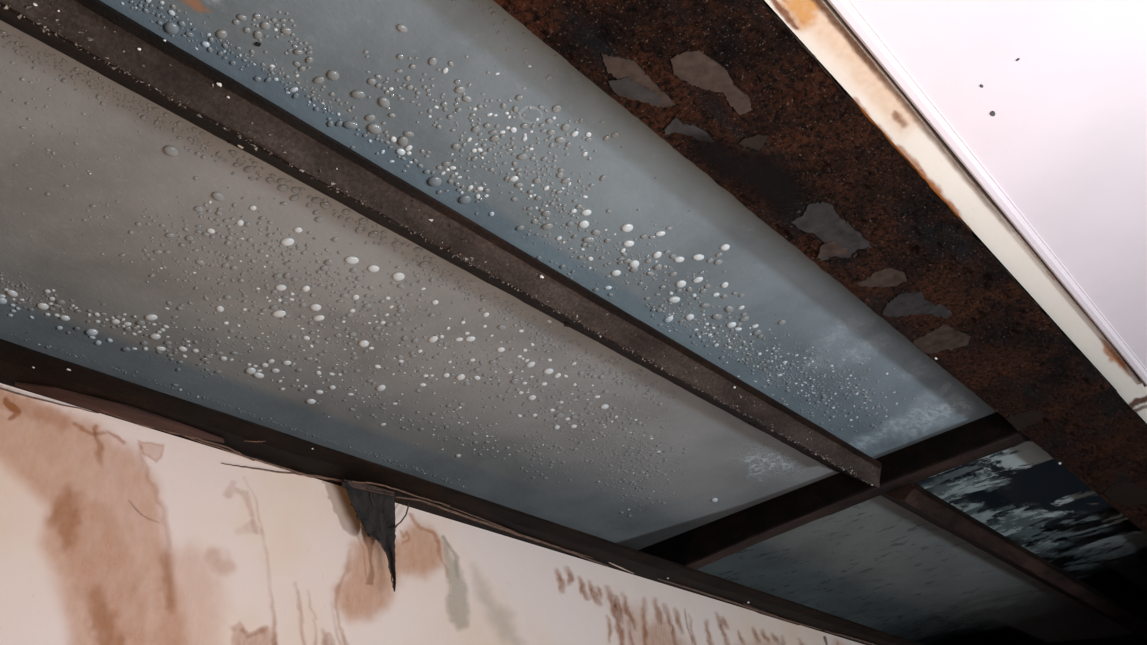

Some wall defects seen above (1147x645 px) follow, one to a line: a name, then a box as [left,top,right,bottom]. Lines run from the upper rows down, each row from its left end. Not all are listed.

peeling [601,53,714,142]
peeling [670,49,751,115]
rust [772,0,945,151]
rust [859,107,960,218]
peeling [791,201,872,261]
peeling [853,267,971,354]
rust [1104,344,1126,370]
water stain [4,396,21,419]
water stain [609,602,647,645]